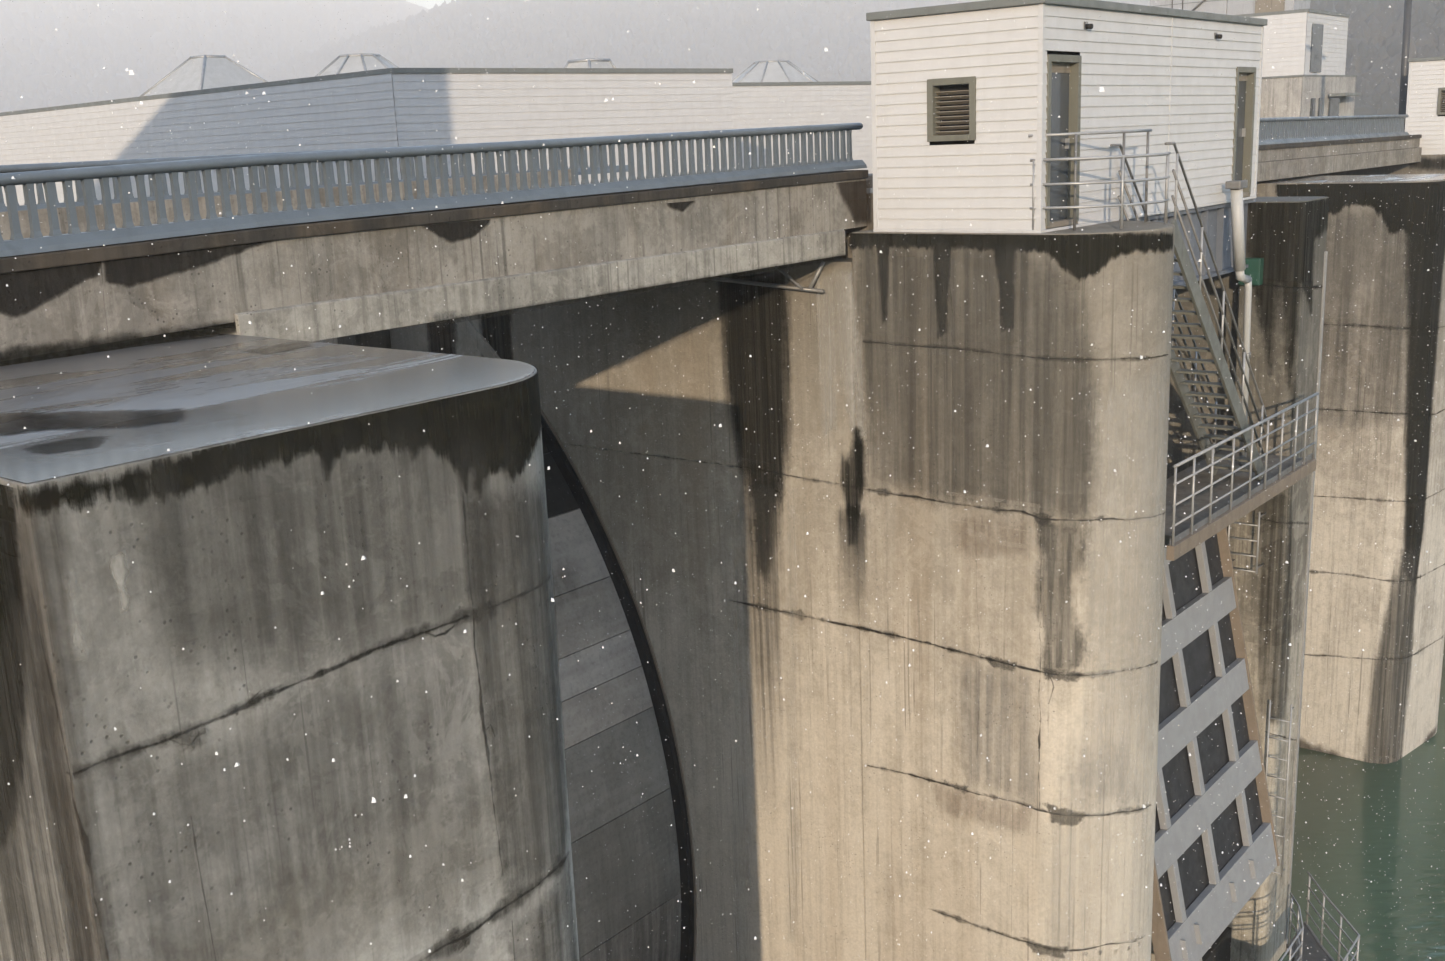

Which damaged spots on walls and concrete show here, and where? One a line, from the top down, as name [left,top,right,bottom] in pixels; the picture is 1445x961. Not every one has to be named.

damp [320,437,337,477]
damp [720,272,789,661]
damp [817,241,1089,672]
damp [1364,201,1445,764]
damp [0,613,91,961]
crack [34,605,63,739]
crack [73,579,549,867]
crack [430,857,566,958]
crack [735,601,1158,825]
crack [941,912,1136,957]